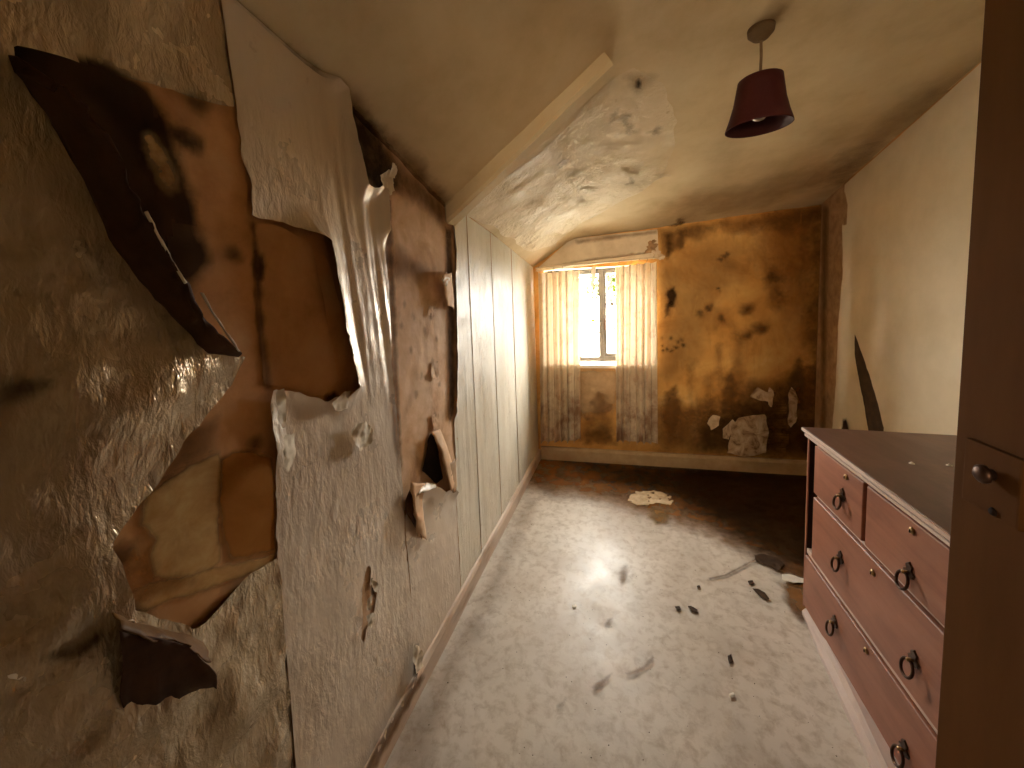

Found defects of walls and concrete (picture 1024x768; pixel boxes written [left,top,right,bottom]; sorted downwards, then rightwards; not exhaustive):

leakage [663,219,708,252]
peeling [352,110,458,510]
leakage [666,288,676,314]
peeling [332,391,350,411]
leakage [659,359,816,455]
peeling [283,434,296,472]
spalling [361,566,378,642]
peeling [112,607,218,716]